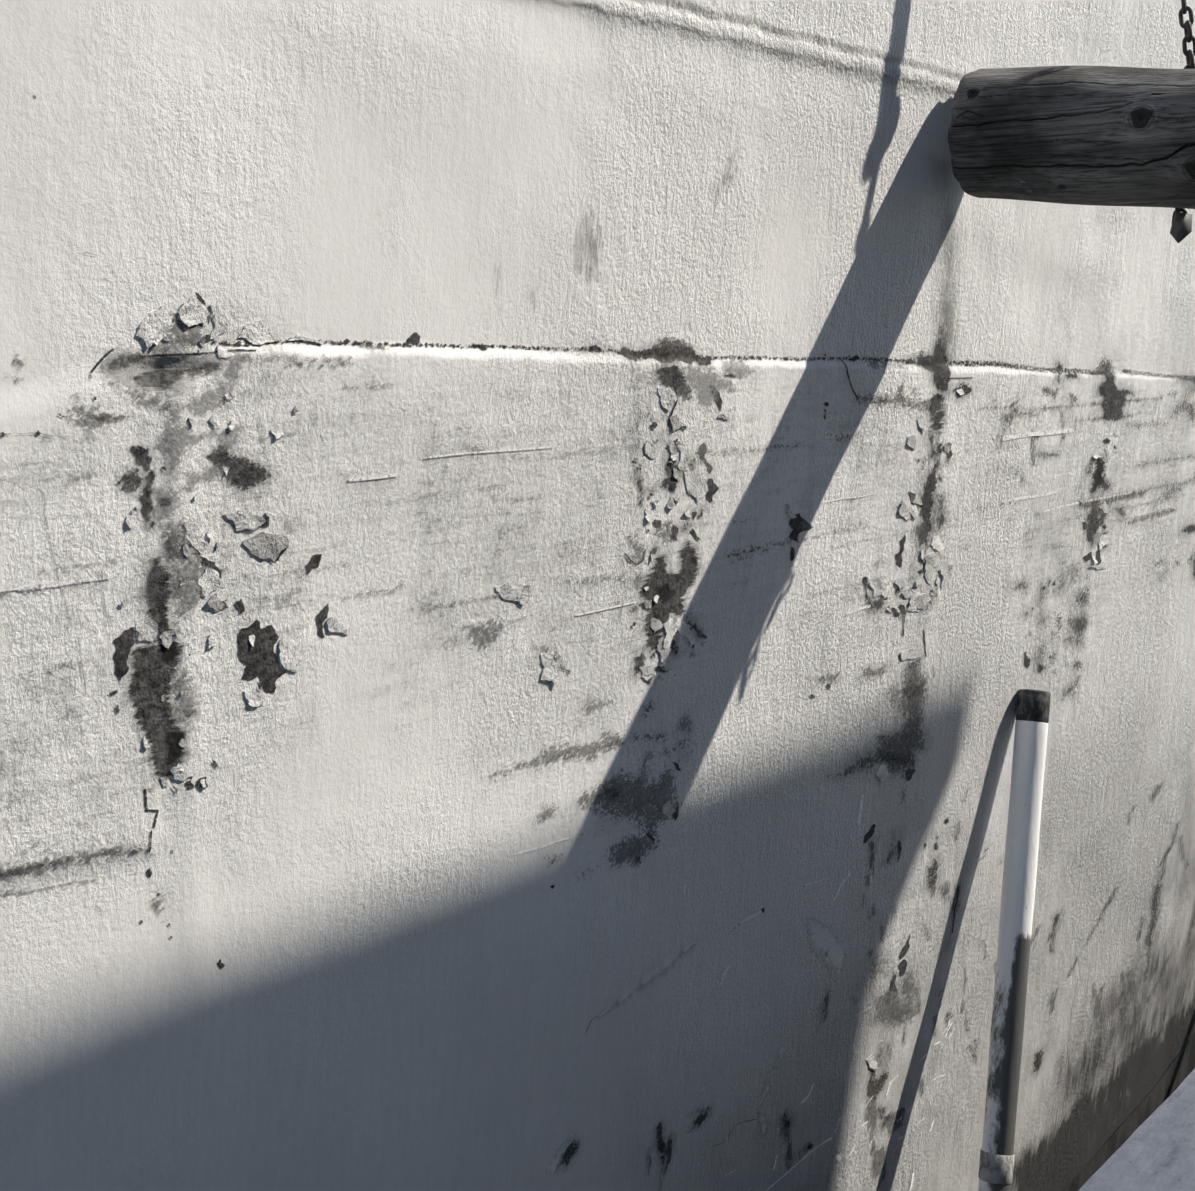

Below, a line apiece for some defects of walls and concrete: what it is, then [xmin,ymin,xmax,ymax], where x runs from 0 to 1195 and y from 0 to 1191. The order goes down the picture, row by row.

peeling [136,292,323,358]
leakage [984,392,1177,466]
peeling [633,415,719,541]
leakage [976,470,1194,524]
peeling [223,510,290,562]
peeling [786,503,813,561]
peeling [109,627,135,714]
peeling [237,620,297,707]
leakage [864,658,927,708]
peeling [170,759,219,793]
leakage [828,735,914,778]
leakage [606,832,660,868]